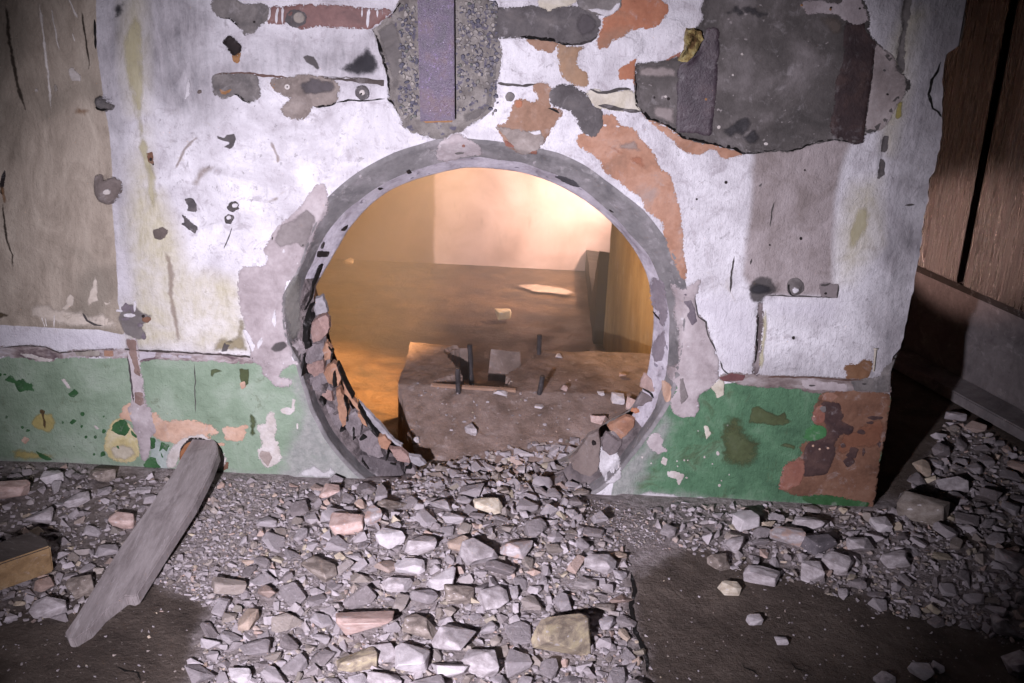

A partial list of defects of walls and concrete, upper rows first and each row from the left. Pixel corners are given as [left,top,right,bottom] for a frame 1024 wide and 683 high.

crack [6,10,25,107]
crack [927,62,942,117]
spalling [372,0,687,281]
peeling [643,114,742,160]
peeling [0,279,298,471]
flaking render [301,242,432,477]
spalling [649,277,668,362]
flaking render [568,373,655,476]
peeling [641,432,688,485]
peeling [803,424,827,441]
peeling [802,494,870,507]